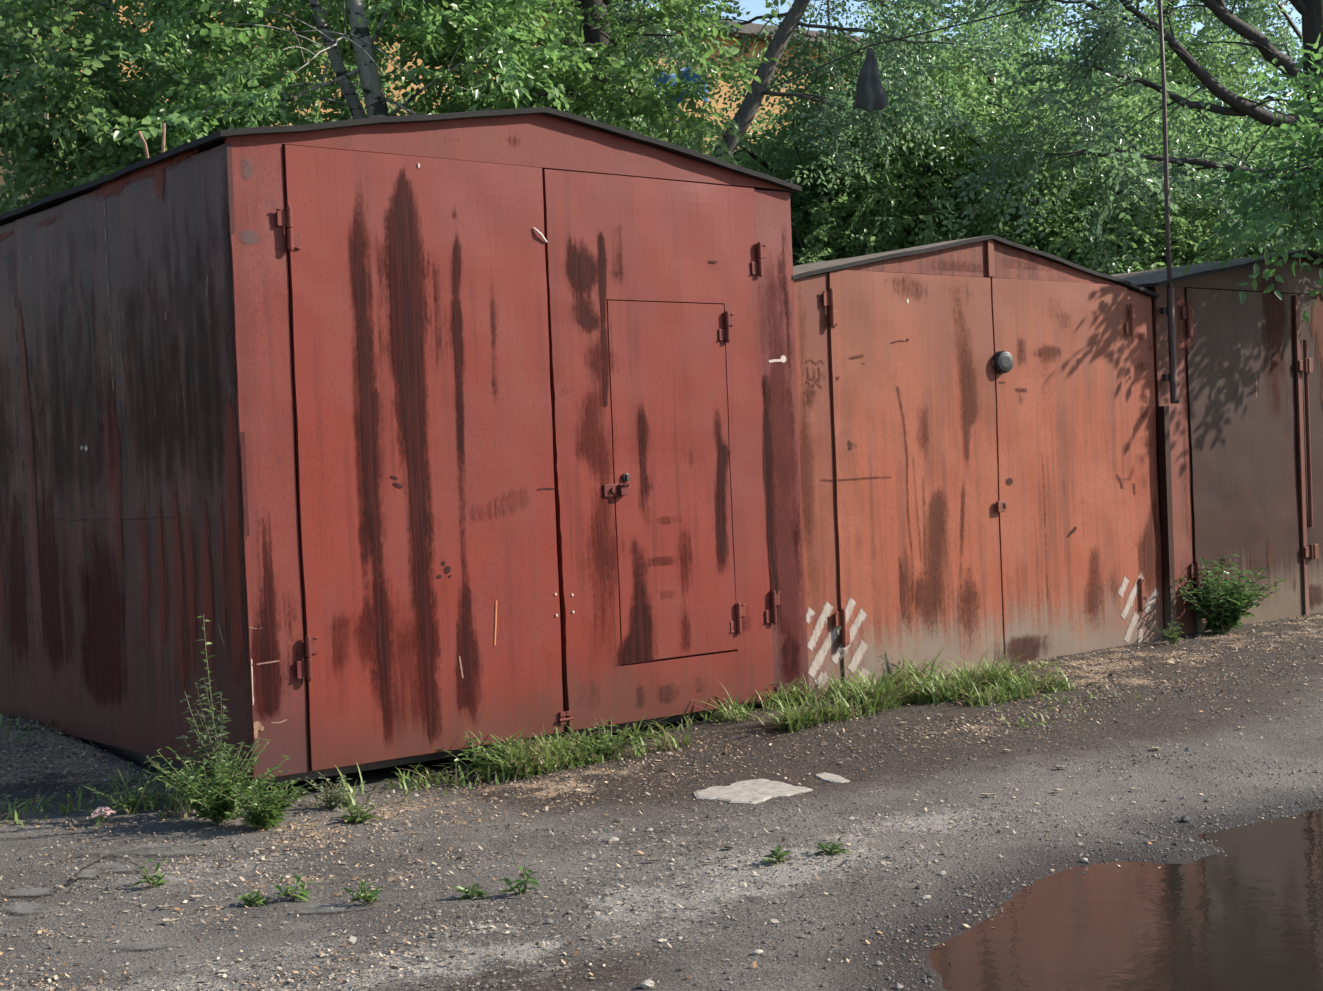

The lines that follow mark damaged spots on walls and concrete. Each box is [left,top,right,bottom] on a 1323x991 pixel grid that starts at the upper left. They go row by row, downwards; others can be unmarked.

rust [221,180,236,390]
rust [350,169,481,743]
rust [565,231,624,646]
rust [637,406,670,524]
rust [618,533,692,665]
rust [715,411,731,572]
rust [763,234,824,684]
rust [918,482,980,638]
rust [954,289,978,459]
rust [1262,276,1288,412]